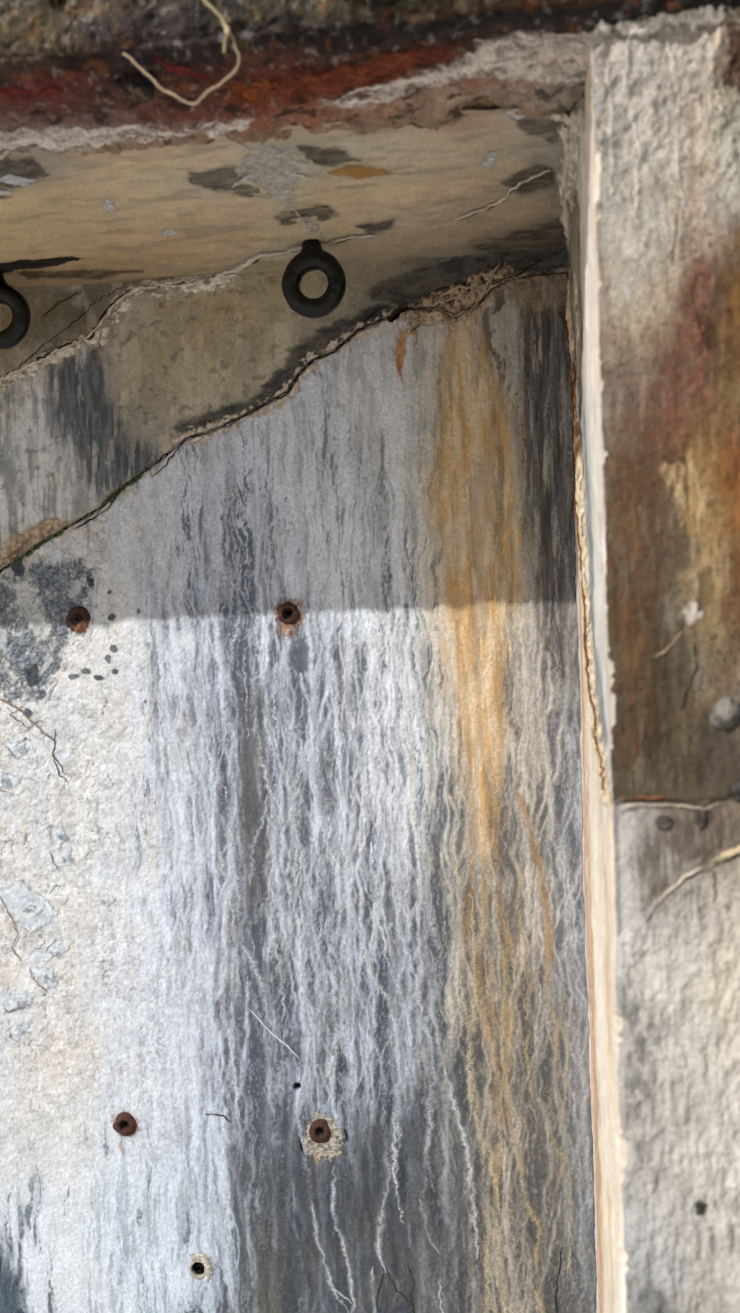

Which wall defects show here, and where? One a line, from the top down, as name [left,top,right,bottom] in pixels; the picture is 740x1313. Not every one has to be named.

peeling [110,69,158,99]
crack [0,235,377,378]
crack [0,257,569,573]
corrosion [395,330,417,384]
corrosion [69,619,90,634]
corrosion [428,308,523,862]
damp [509,295,607,939]
crack [565,311,730,821]
corrosion [661,446,723,622]
crack [1,699,69,783]
damp [129,530,549,1313]
crack [647,846,740,921]